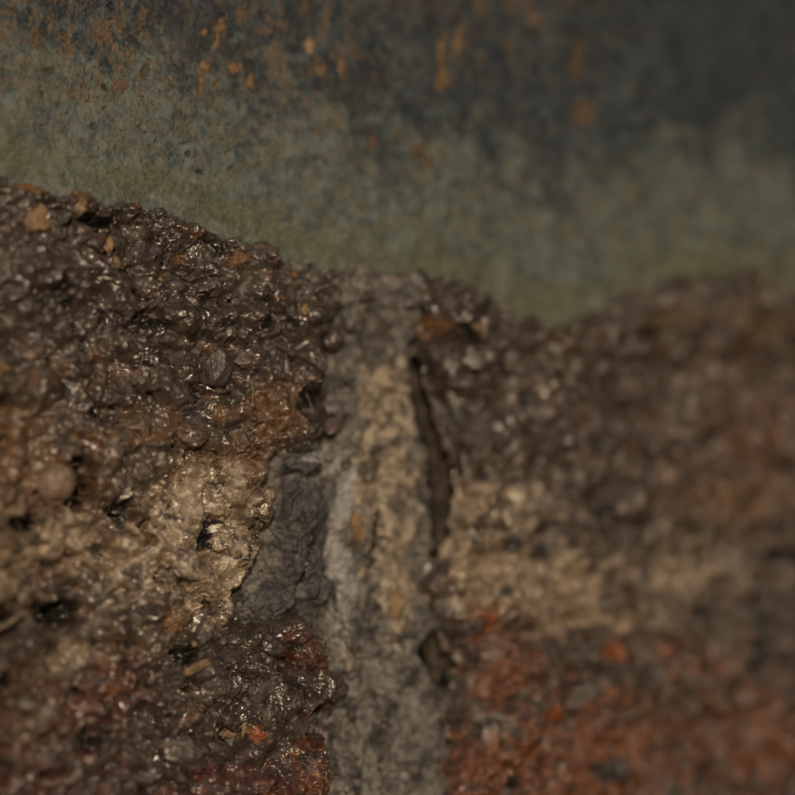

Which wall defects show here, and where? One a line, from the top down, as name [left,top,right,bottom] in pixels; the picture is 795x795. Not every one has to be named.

rust [196,17,225,94]
crack [407,332,456,560]
crack [420,623,458,762]